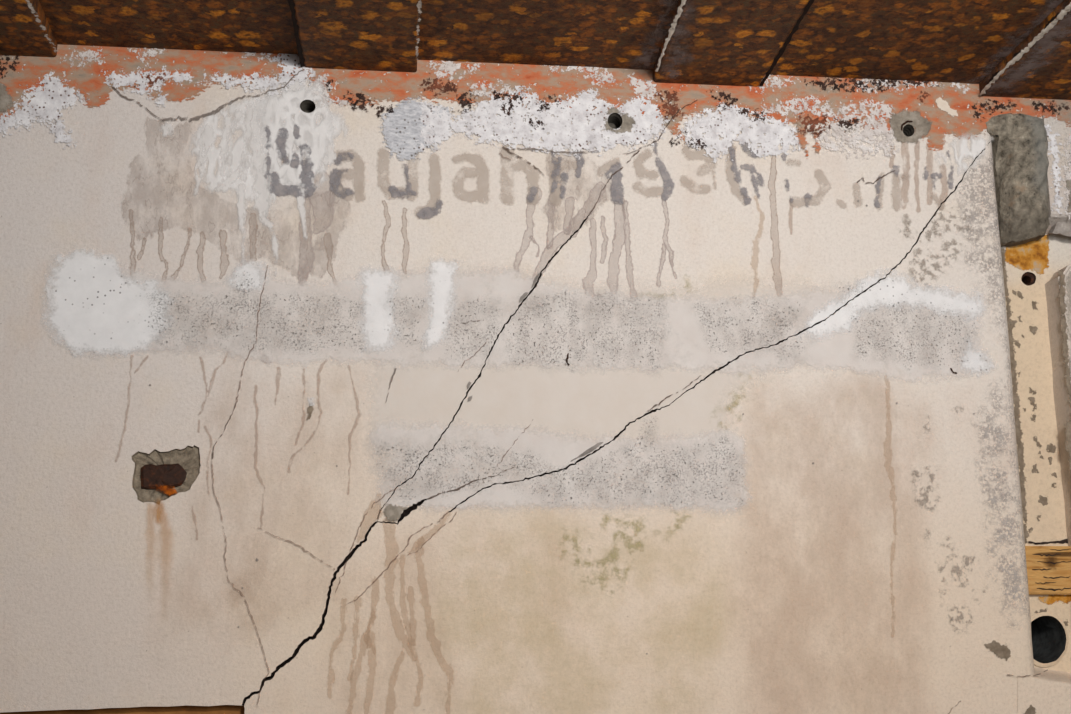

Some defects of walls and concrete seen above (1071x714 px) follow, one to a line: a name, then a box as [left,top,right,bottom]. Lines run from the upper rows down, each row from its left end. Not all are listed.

damp [123,79,361,363]
damp [381,201,409,274]
damp [510,182,662,366]
damp [656,198,677,287]
damp [704,155,803,357]
rust [1004,235,1050,275]
peeling [1009,316,1038,348]
crack [211,100,990,706]
peeling [1024,388,1037,422]
flaking render [1028,270,1071,535]
flaking render [132,445,201,505]
damp [547,438,742,503]